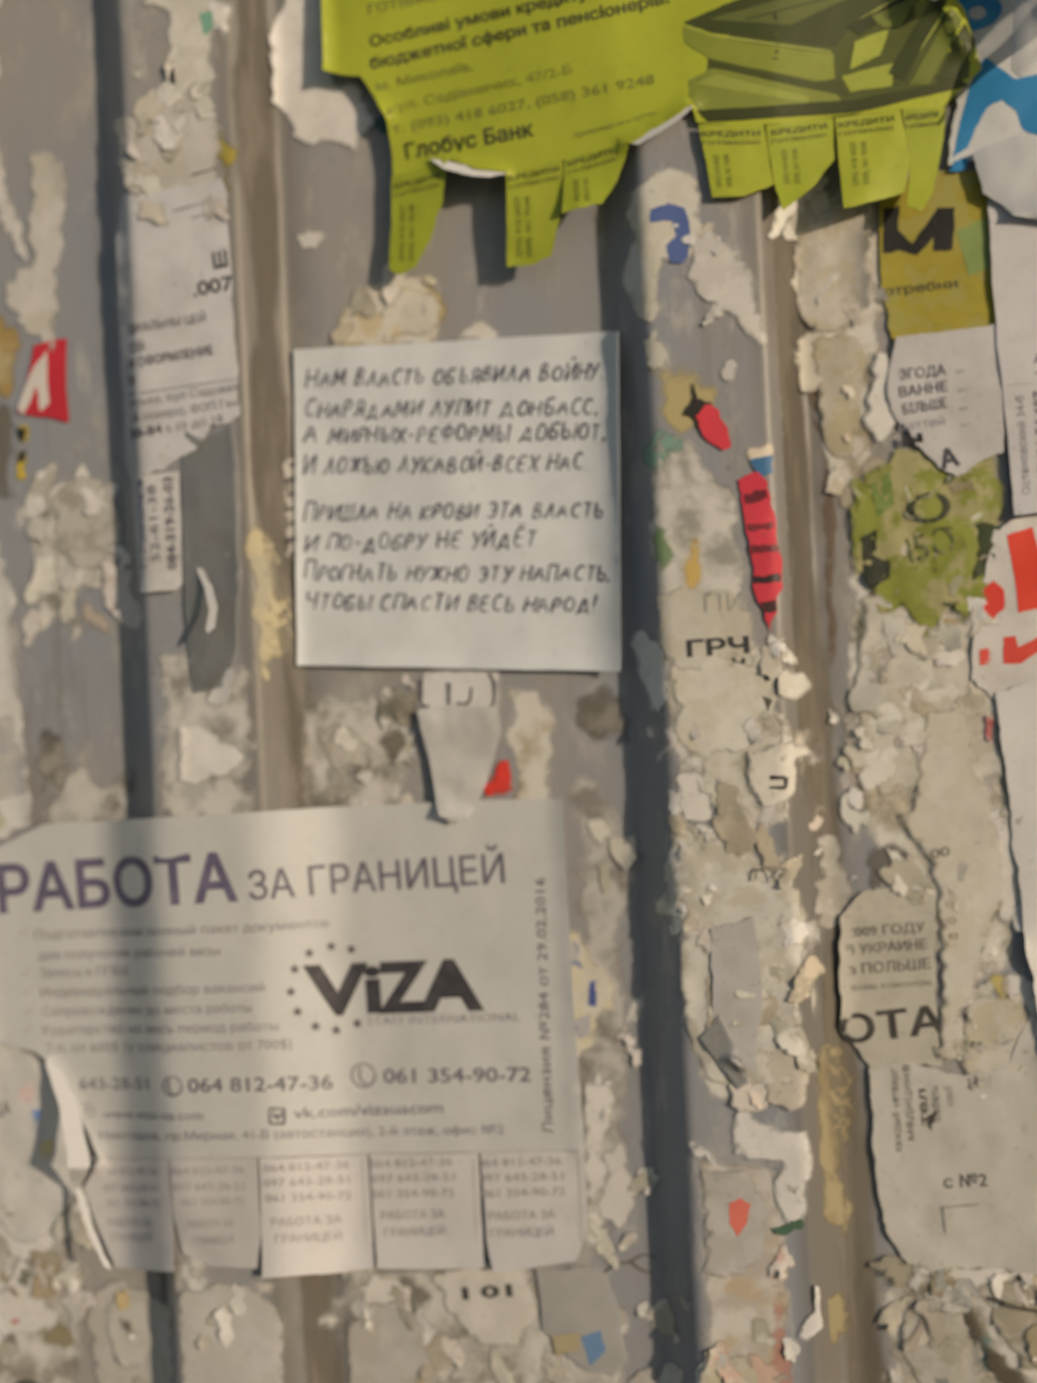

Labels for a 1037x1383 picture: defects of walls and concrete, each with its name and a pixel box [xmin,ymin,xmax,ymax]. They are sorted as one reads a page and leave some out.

peeling [208,0,231,32]
peeling [122,45,216,197]
peeling [17,462,145,639]
peeling [656,596,1001,936]
peeling [985,775,1023,838]
peeling [0,1194,156,1383]
peeling [658,1319,800,1383]
peeling [768,1245,795,1279]